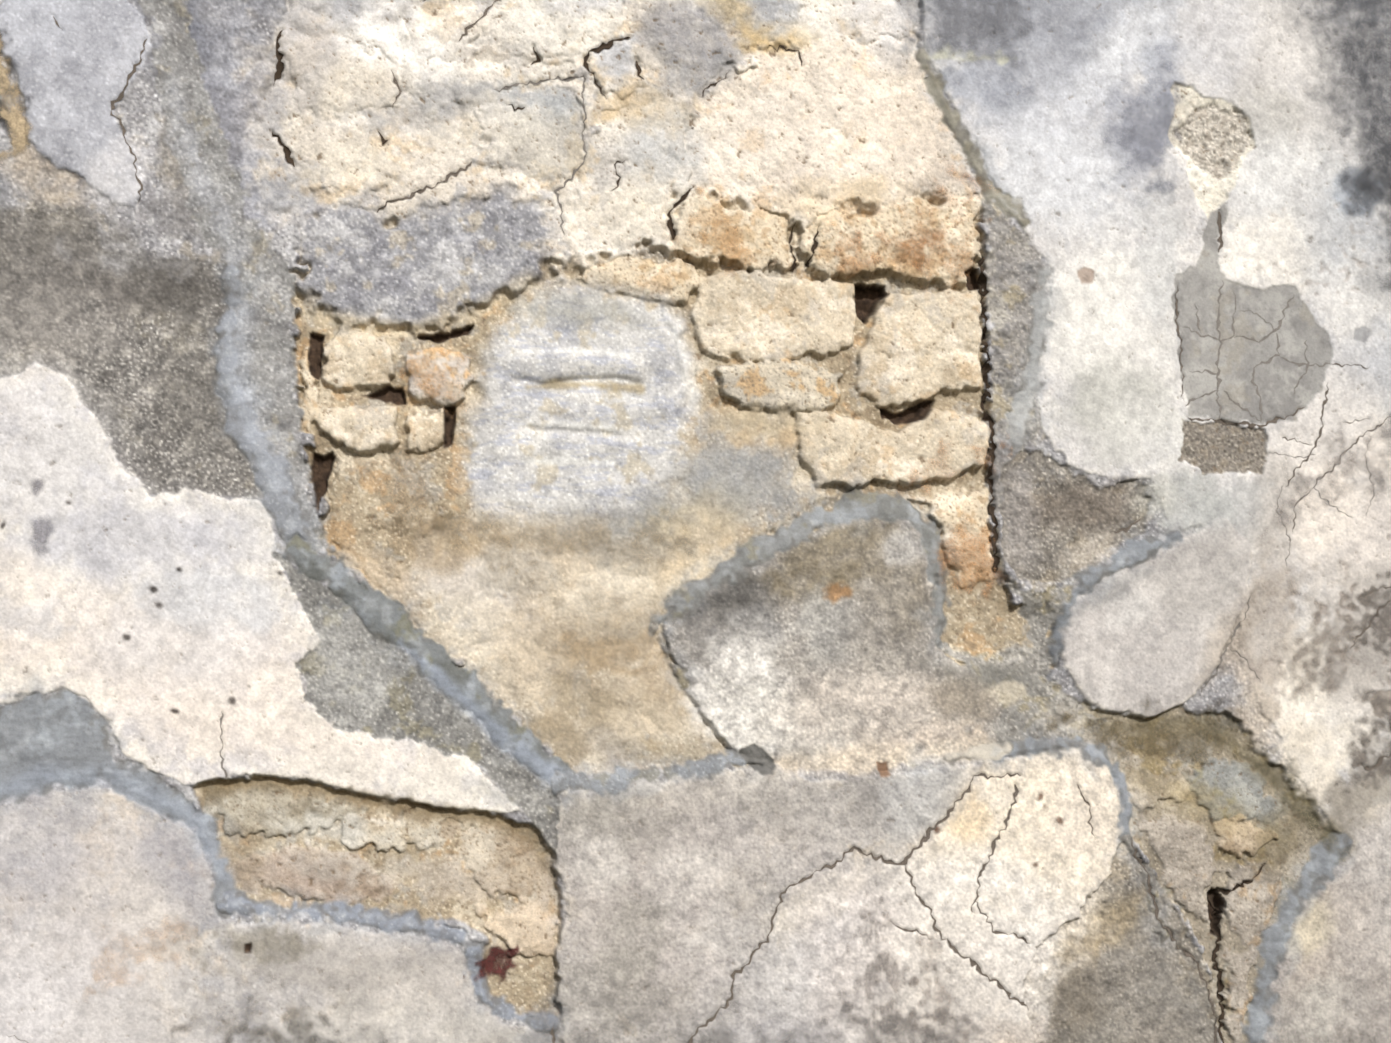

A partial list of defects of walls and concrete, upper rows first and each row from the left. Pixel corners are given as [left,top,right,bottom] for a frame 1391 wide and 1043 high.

peeling [0,42,30,158]
crack [494,37,644,235]
crack [667,187,694,240]
spalling [1168,83,1256,219]
damp [1332,0,1391,199]
spalling [254,0,1153,778]
crack [977,257,1000,572]
peeling [1179,420,1269,476]
crack [1175,212,1391,566]
spalling [204,554,563,1017]
crack [689,773,1029,1043]
crack [1131,839,1265,1043]